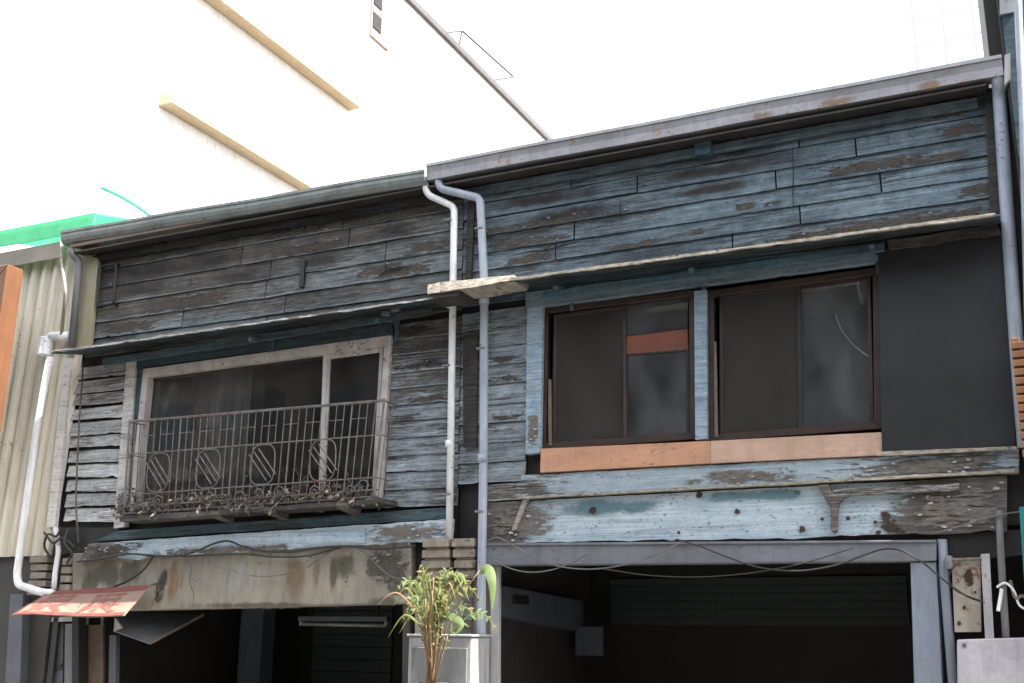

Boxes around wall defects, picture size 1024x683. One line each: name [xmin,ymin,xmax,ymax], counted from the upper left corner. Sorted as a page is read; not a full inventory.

peeling [820,110,985,177]
peeling [765,183,989,243]
peeling [687,468,795,487]
peeling [863,453,1006,477]
peeling [911,482,1004,531]
peeling [487,504,555,541]
corrosion [873,511,906,535]
leakage [82,563,139,589]
leakage [156,571,167,602]
leakage [208,564,298,609]
leakage [330,557,352,585]
leakage [374,597,394,605]